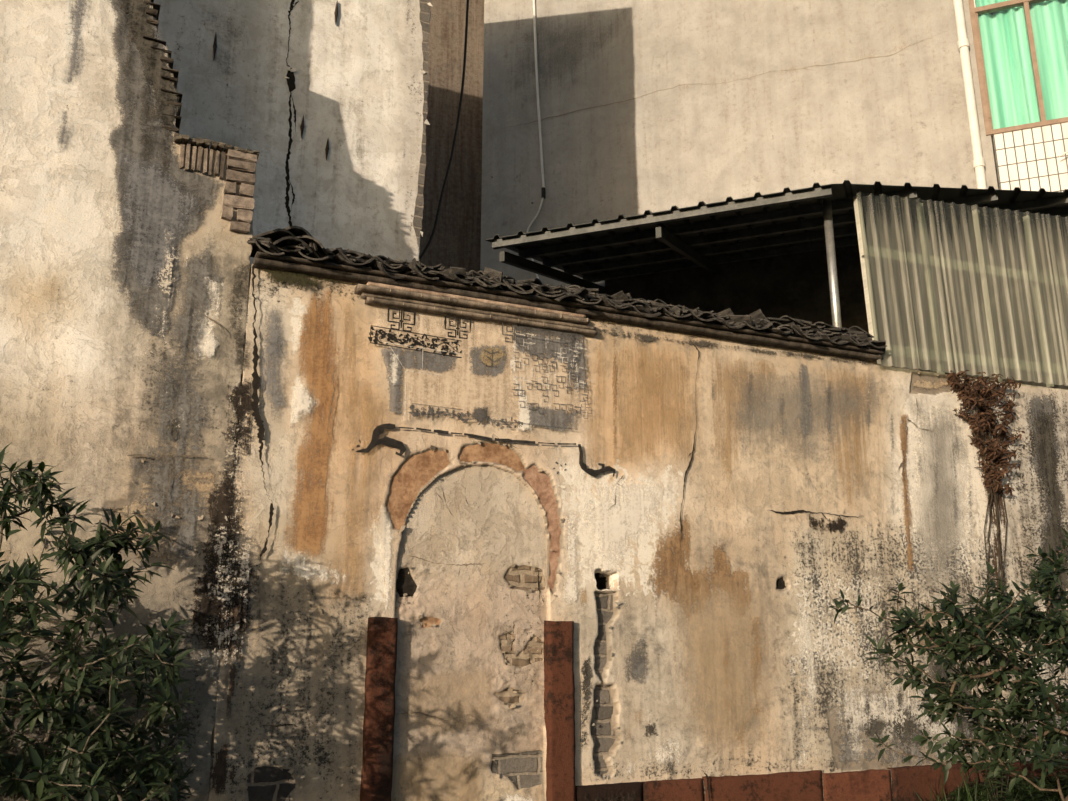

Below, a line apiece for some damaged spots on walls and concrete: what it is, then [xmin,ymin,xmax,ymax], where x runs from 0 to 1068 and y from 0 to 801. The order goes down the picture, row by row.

crack [285,0,298,226]
crack [495,84,687,130]
leakage [109,0,312,715]
crack [197,266,274,560]
crack [676,335,700,580]
leakage [809,517,847,534]
leakage [1026,395,1068,616]
spalling [243,766,296,801]
spalling [491,750,543,790]
spalling [499,631,544,668]
spalling [590,573,622,780]
leakage [830,649,984,760]